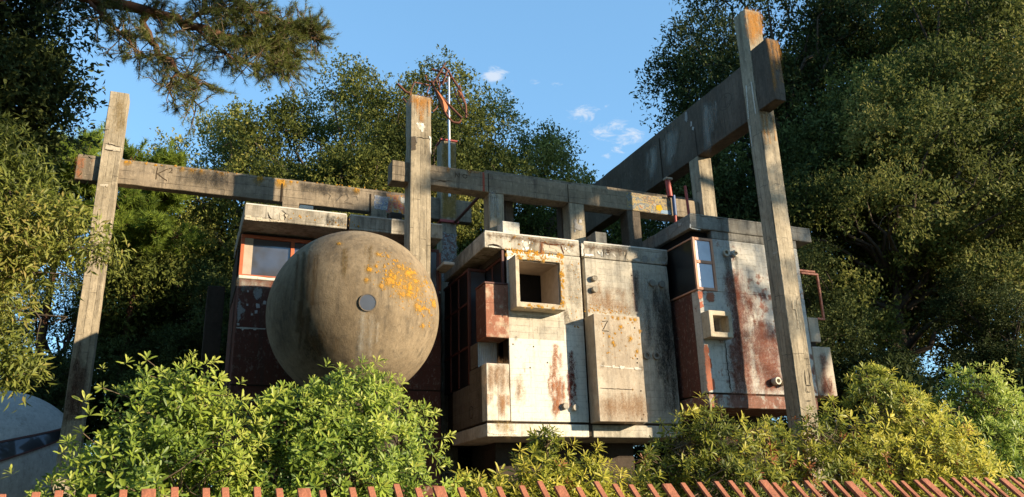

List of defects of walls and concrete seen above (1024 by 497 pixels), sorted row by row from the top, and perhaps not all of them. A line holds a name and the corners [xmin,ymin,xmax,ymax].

rust [549,345,578,414]
damp [591,284,676,405]
rust [725,275,780,394]